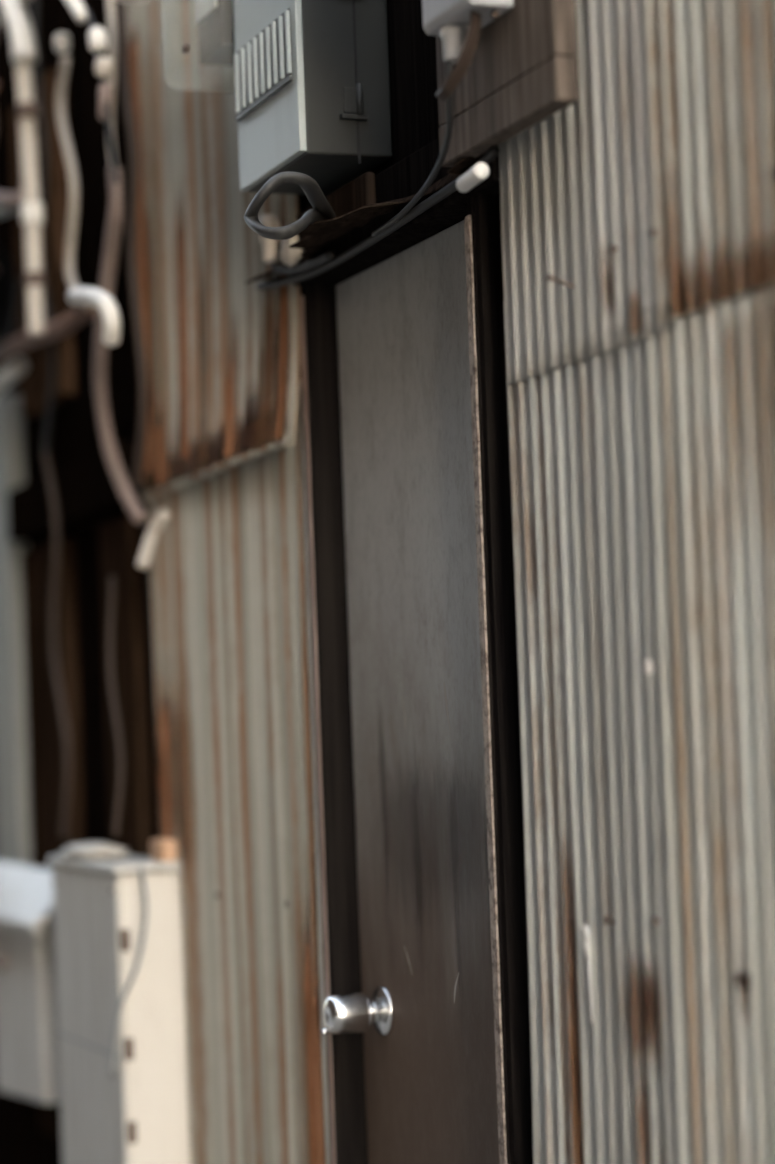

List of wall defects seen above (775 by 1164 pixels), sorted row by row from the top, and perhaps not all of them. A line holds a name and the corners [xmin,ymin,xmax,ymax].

corrosion [667,220,775,313]
corrosion [630,973,661,1054]
corrosion [638,1088,652,1164]